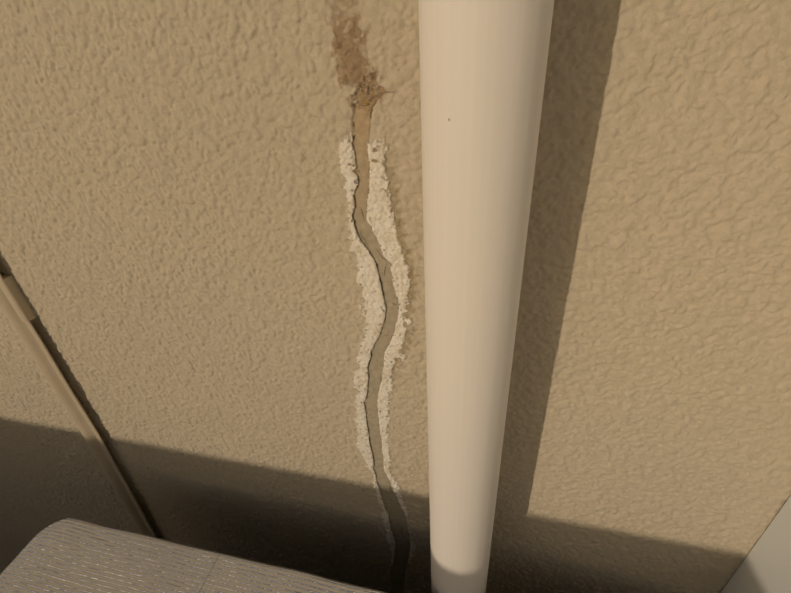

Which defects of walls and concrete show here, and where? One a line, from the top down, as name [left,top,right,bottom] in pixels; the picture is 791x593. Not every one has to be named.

crack [337,89,418,593]